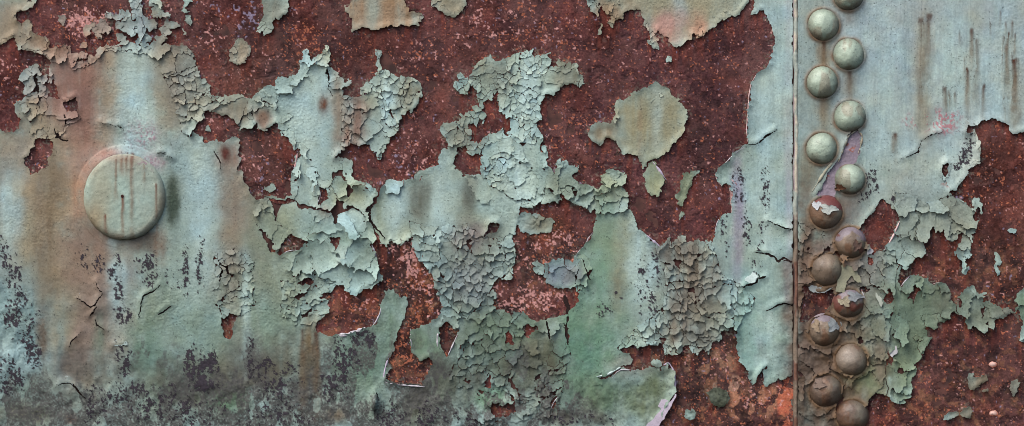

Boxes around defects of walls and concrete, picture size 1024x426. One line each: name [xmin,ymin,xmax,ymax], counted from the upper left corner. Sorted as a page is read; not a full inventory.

damp [75,235,315,426]
crack [217,258,234,282]
peeling [0,0,629,425]
damp [318,330,377,402]
corrosion [0,0,775,386]
crack [742,252,792,288]
peeling [565,0,1024,426]
corrosion [859,118,1024,426]